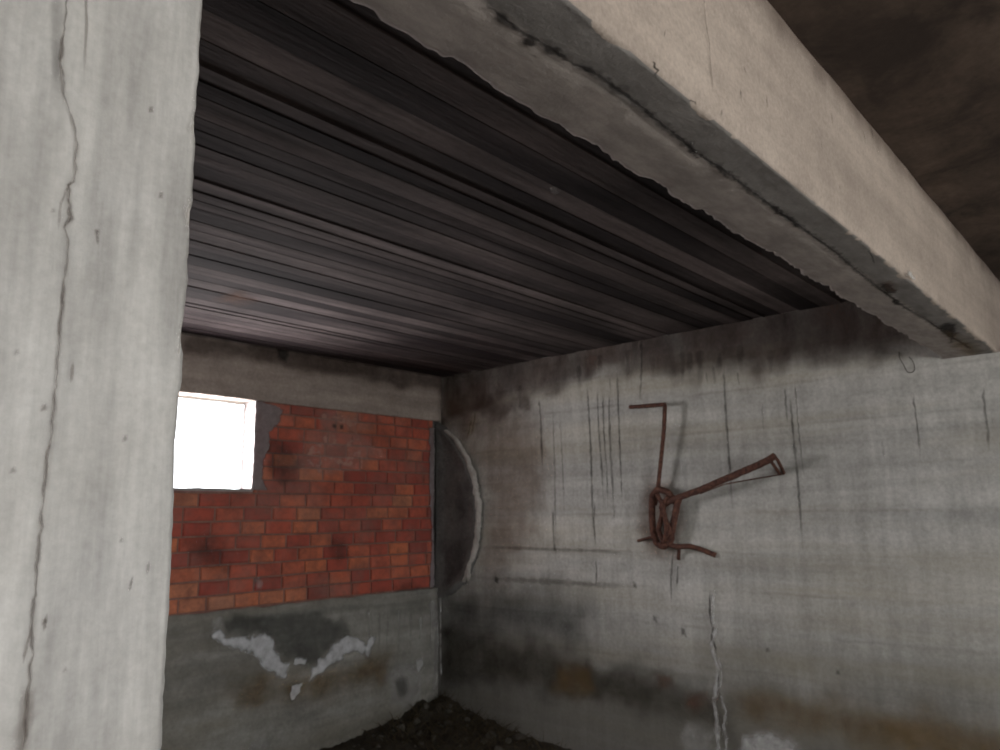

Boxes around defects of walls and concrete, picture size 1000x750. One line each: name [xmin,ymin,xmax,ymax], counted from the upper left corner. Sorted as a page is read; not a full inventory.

crack [64,177,75,228]
water stain [441,301,905,426]
crack [36,385,57,567]
corrosion [629,403,786,560]
water stain [440,626,658,703]
crack [709,596,726,744]